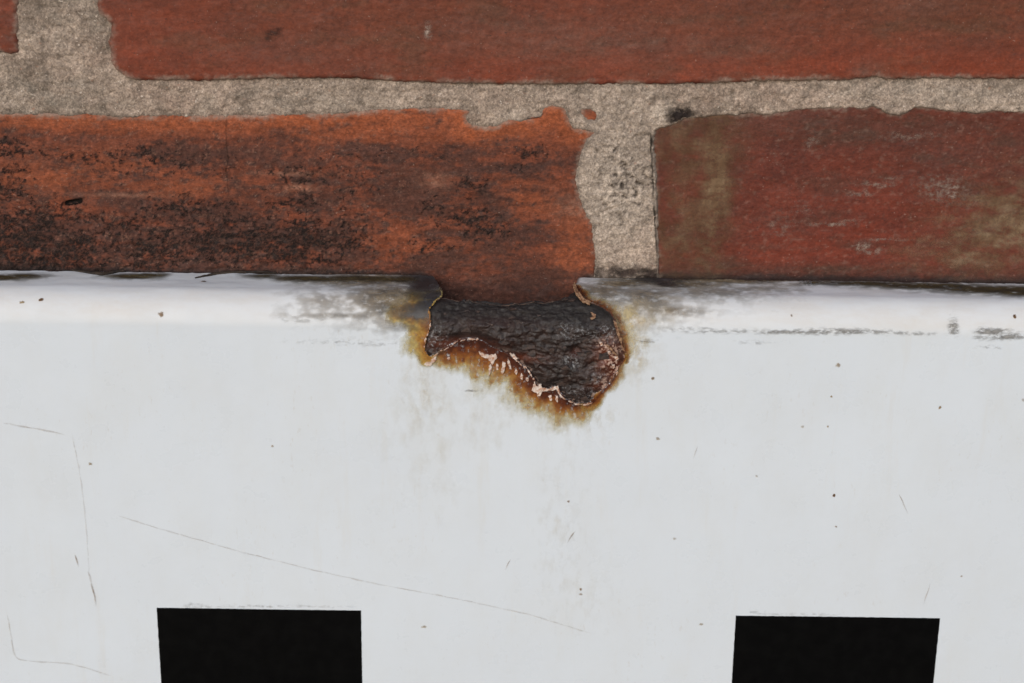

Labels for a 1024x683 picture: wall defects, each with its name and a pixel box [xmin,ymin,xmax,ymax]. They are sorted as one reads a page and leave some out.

rust [386,282,635,425]